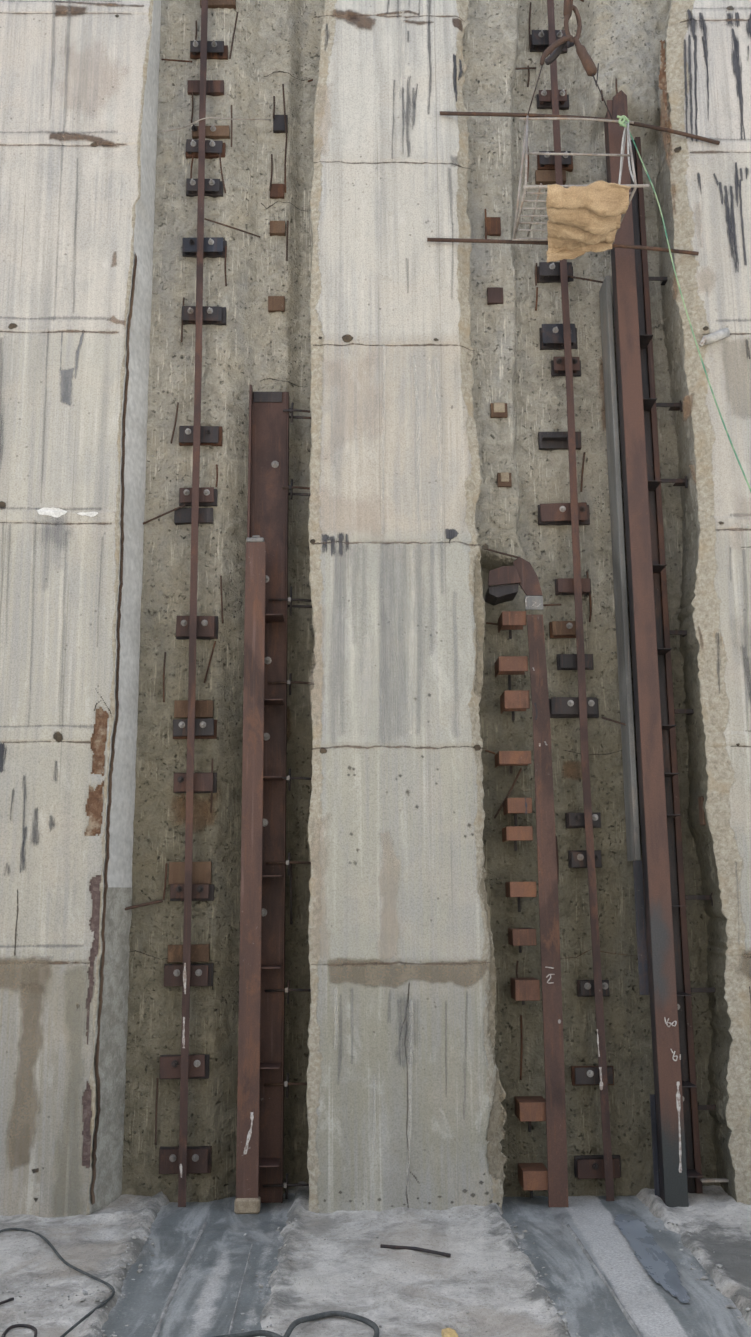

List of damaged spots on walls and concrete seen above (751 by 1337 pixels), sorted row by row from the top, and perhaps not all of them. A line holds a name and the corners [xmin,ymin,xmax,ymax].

damp [387,0,432,155]
spalling [658,40,668,127]
damp [684,9,709,142]
damp [726,12,751,139]
damp [697,162,748,272]
spalling [473,548,518,697]
damp [740,646,751,701]
damp [0,957,49,1168]
spalling [479,866,507,1184]